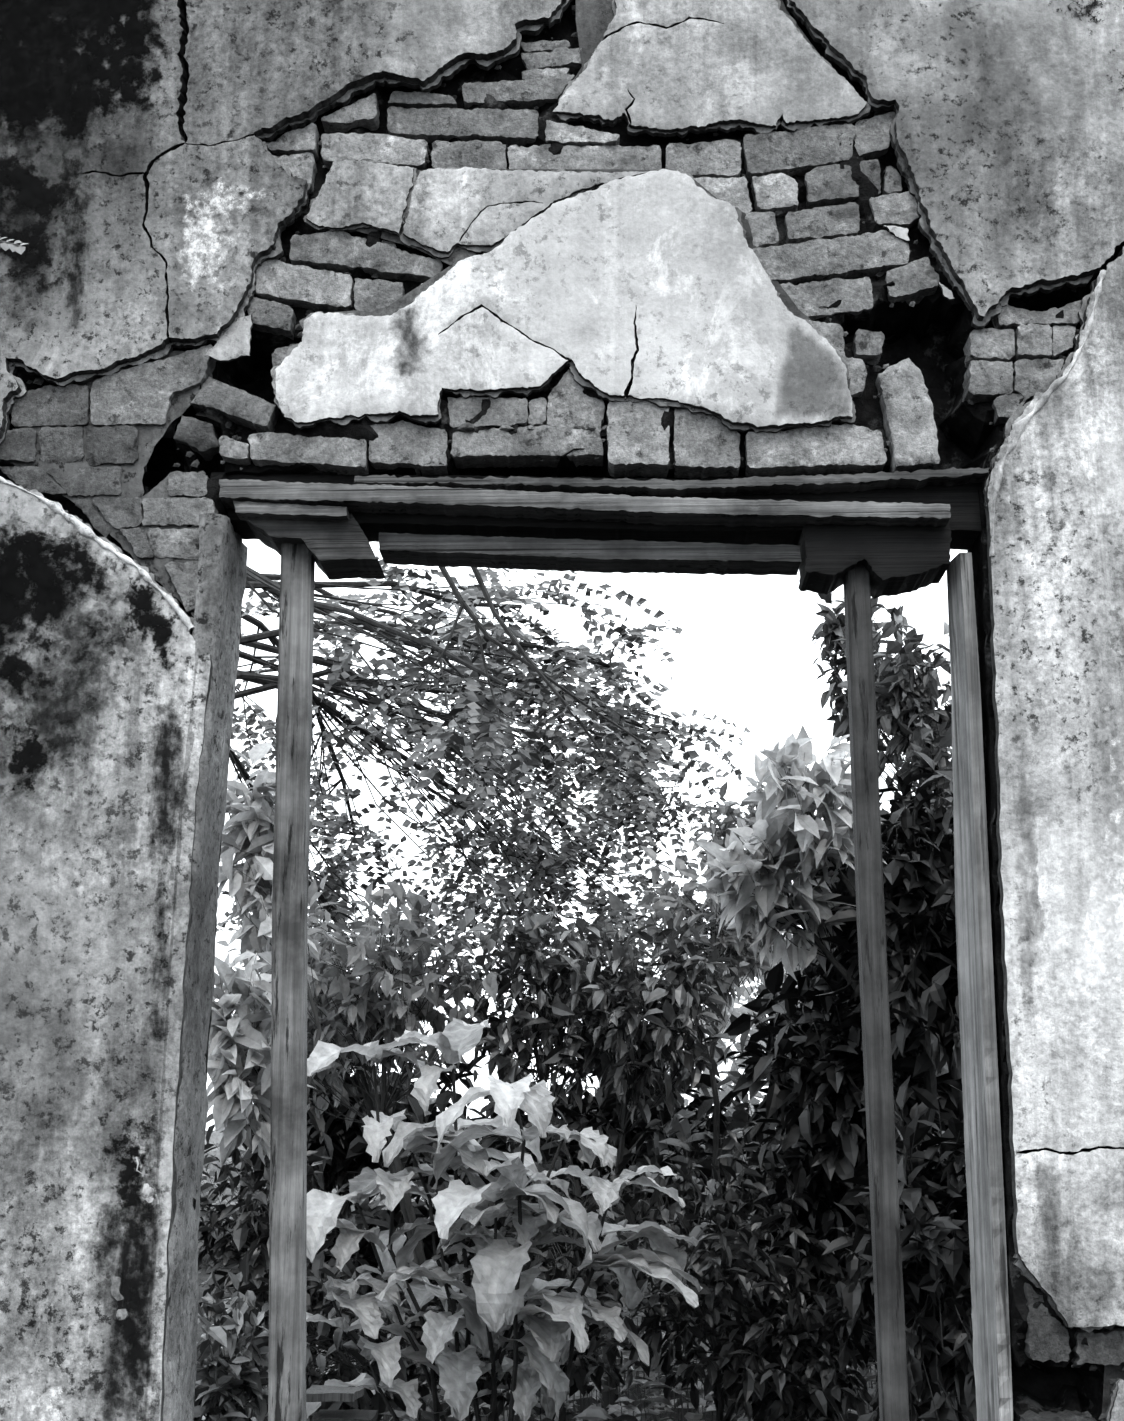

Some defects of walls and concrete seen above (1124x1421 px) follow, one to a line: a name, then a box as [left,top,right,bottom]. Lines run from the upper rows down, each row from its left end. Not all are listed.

water stain [0,0,172,324]
crack [76,0,256,343]
spalling [0,0,954,631]
crack [459,201,538,242]
crack [438,305,571,362]
crack [624,307,639,400]
spalling [962,270,1106,557]
crack [1097,242,1124,277]
water stain [0,519,183,792]
water stain [149,704,187,1039]
spalling [1014,1266,1124,1421]